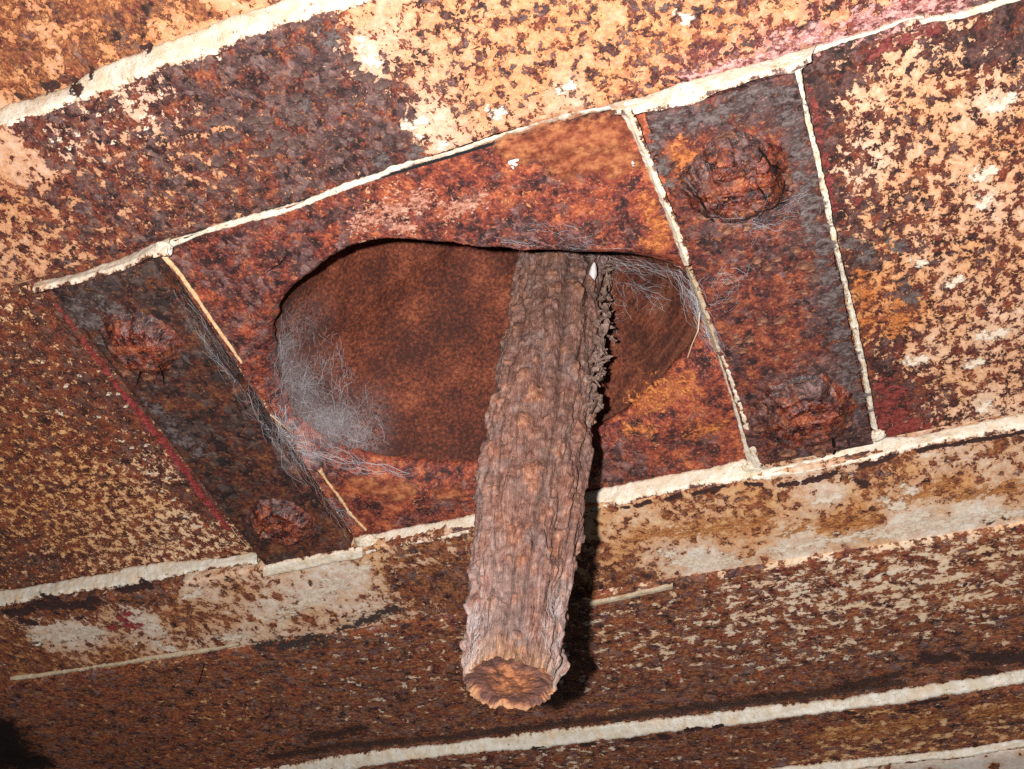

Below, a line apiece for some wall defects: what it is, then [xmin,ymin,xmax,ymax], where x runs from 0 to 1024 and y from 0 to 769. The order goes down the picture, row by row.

corrosion [342,51,392,100]
corrosion [199,63,338,171]
corrosion [495,107,639,179]
corrosion [668,133,702,182]
corrosion [346,183,492,238]
corrosion [637,193,675,251]
corrosion [751,246,820,295]
corrosion [850,268,911,339]
corrosion [585,257,620,414]
corrosion [621,367,700,438]
corrosion [682,416,730,441]
corrosion [811,445,826,458]